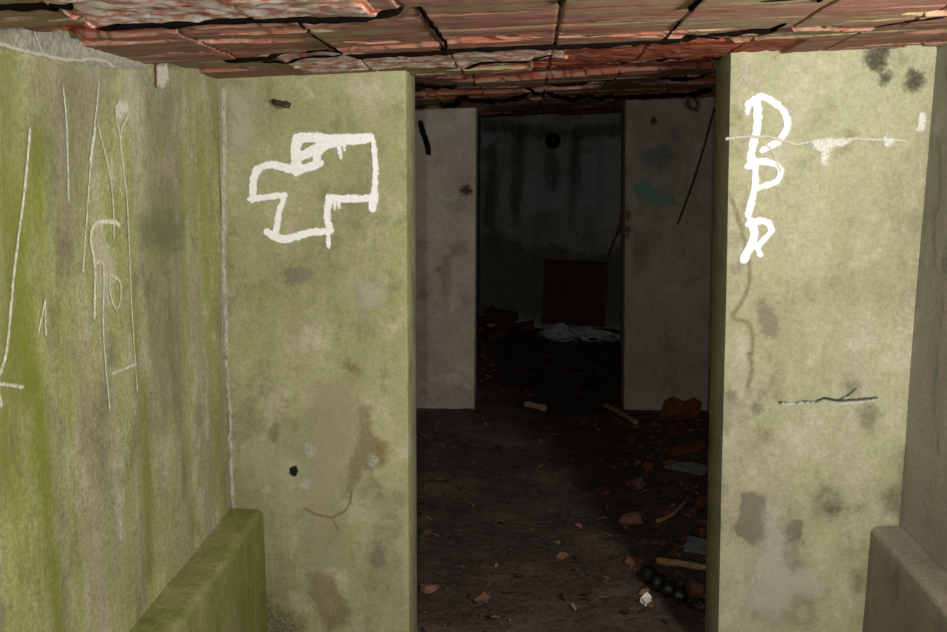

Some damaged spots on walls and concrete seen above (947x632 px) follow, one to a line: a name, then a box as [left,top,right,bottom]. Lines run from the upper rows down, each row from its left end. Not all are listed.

crack [0,2,114,68]
damp [157,63,169,89]
crack [97,0,792,109]
spalling [415,38,808,98]
damp [865,49,891,82]
crack [875,16,947,27]
damp [907,70,923,90]
damp [115,100,128,119]
crack [726,135,906,172]
damp [221,88,235,507]
crack [304,490,353,530]
damp [736,492,827,623]